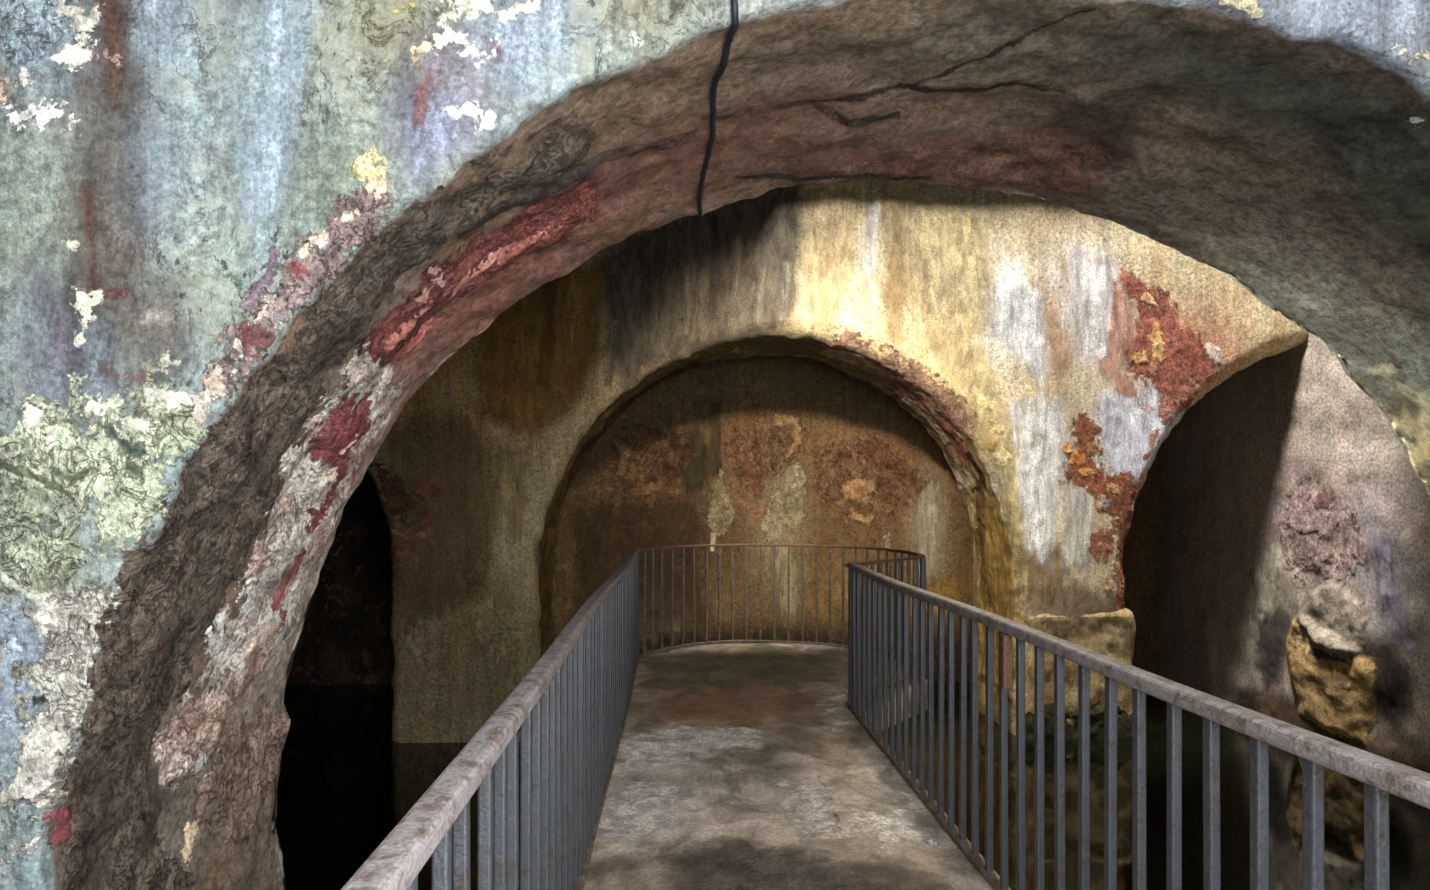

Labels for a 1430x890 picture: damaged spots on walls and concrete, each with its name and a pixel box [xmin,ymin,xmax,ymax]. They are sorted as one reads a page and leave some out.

peeling [0,0,124,141]
peeling [410,0,541,71]
peeling [628,30,645,48]
crack [716,8,1096,127]
peeling [443,100,497,130]
crack [735,173,931,182]
peeling [0,115,696,890]